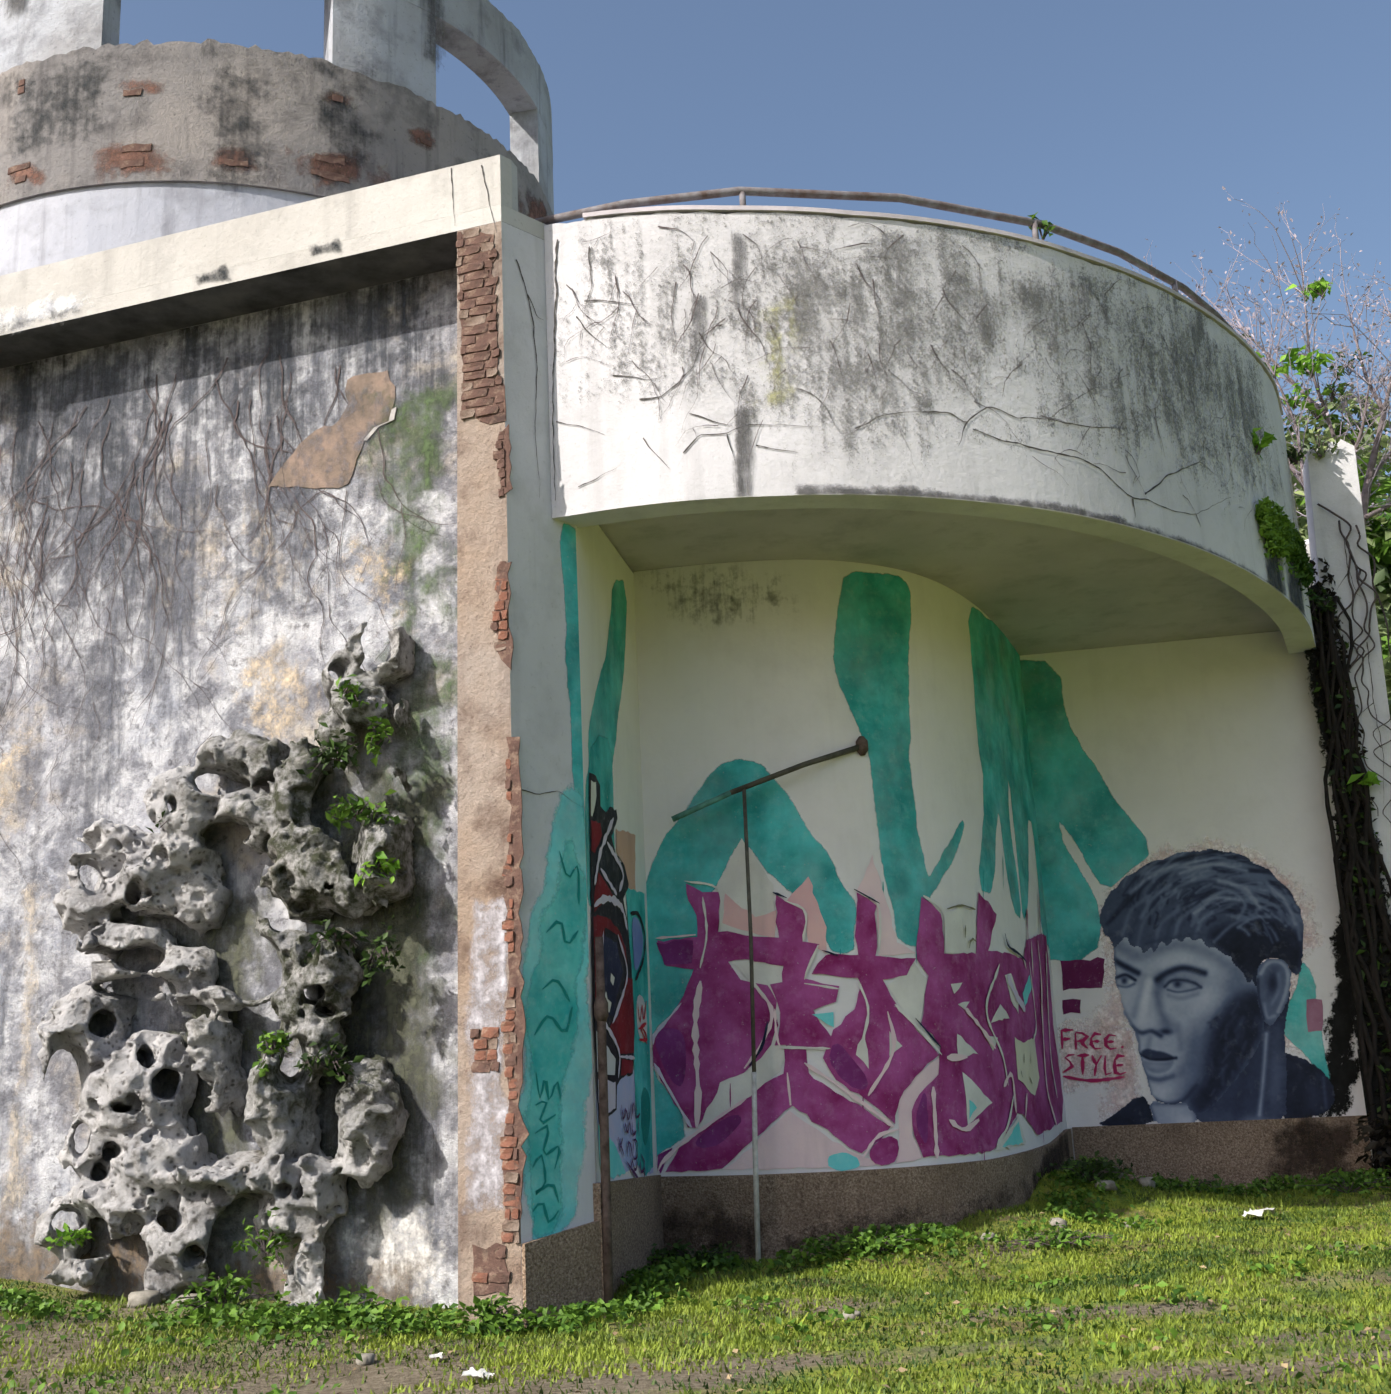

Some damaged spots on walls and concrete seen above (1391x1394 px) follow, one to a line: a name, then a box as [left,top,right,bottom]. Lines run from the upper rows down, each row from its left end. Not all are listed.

damp [198,266,228,282]
peeling [269,370,397,489]
crack [451,165,497,233]
spalling [456,228,513,498]
crack [516,239,638,501]
crack [613,334,1231,526]
damp [558,213,1301,535]
damp [1,279,444,845]
spalling [490,561,514,670]
damp [797,485,1391,1180]
spalling [470,737,529,1295]
damp [323,1161,434,1305]